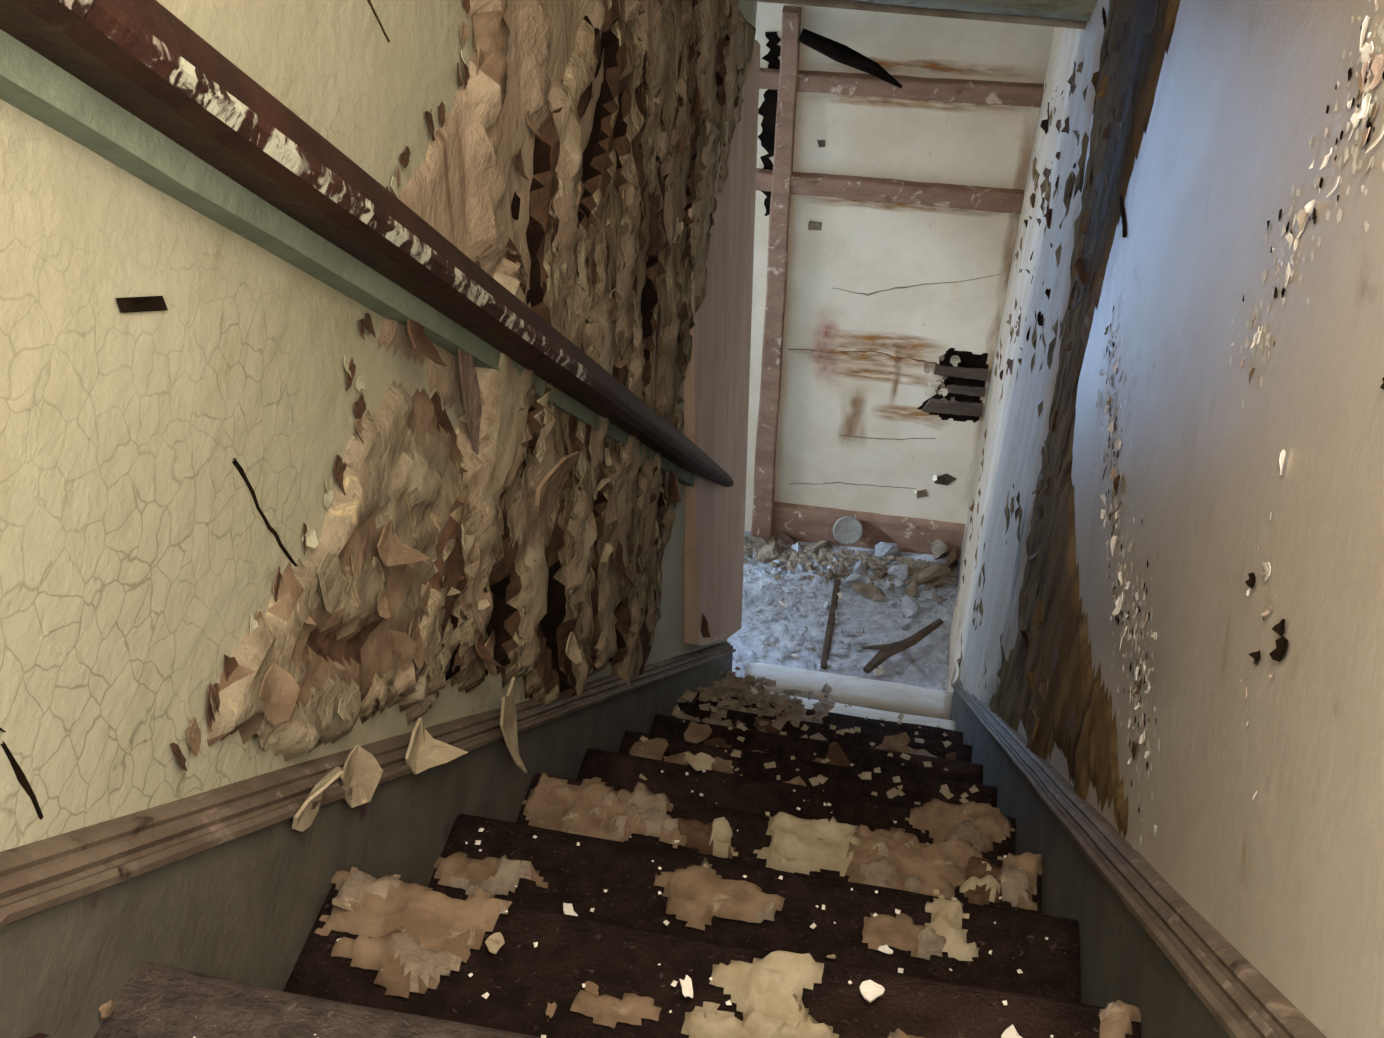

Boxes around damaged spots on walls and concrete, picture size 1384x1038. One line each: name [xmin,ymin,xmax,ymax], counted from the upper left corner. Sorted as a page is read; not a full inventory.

peeling [386,0,756,432]
flaking render [805,217,822,230]
crack [834,274,1000,296]
peeling [1229,0,1384,388]
crack [0,728,44,819]
peeling [170,310,1043,961]